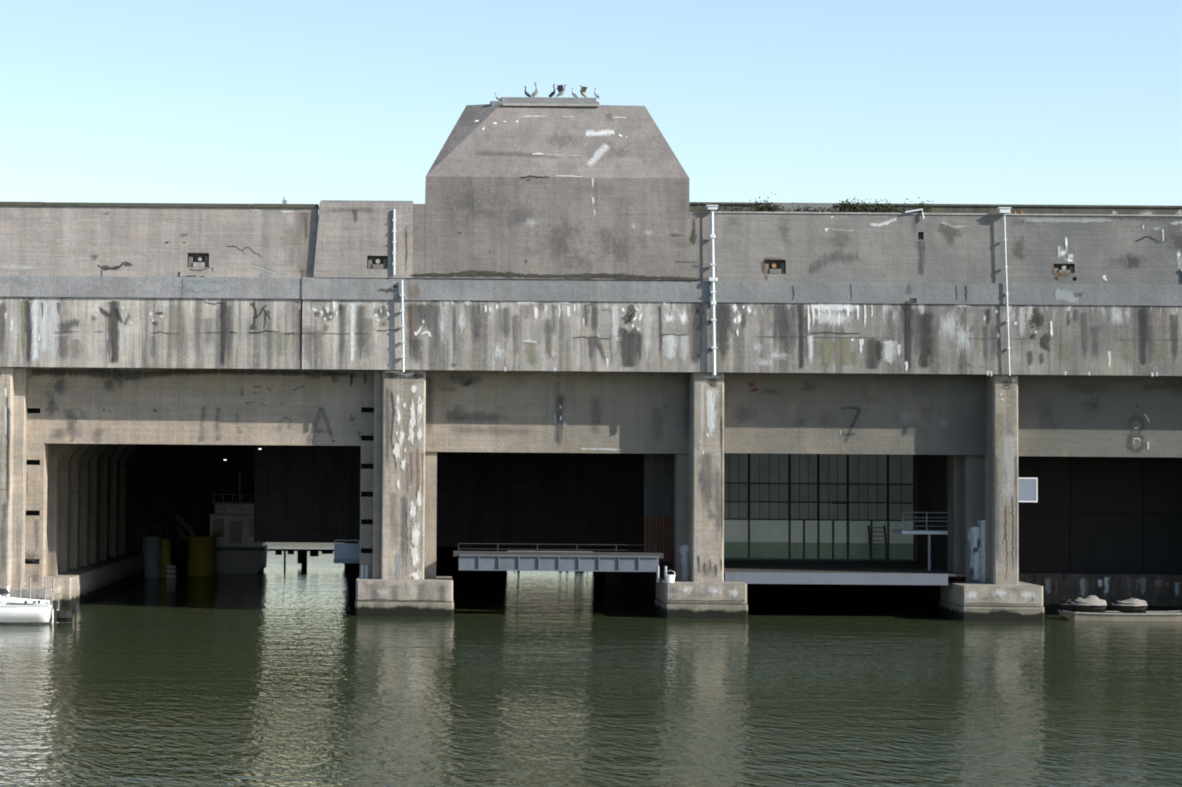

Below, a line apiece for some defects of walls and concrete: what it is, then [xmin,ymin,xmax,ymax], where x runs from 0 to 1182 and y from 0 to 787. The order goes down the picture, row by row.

damp [0,300,366,442]
damp [414,300,469,359]
damp [517,301,641,366]
damp [659,302,675,358]
damp [776,303,990,370]
damp [1124,308,1177,376]
peeling [387,370,424,490]
peeling [409,486,422,580]
peeling [968,520,985,583]